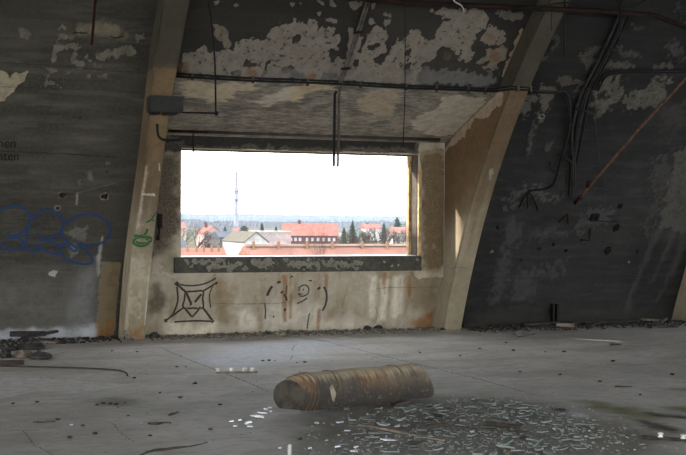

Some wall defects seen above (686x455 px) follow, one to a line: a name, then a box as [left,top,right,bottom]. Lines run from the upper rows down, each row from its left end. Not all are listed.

peeling [0,69,30,102]
peeling [39,13,145,90]
peeling [175,0,525,155]
peeling [516,0,686,160]
peeling [104,162,370,340]
rust [278,273,296,326]